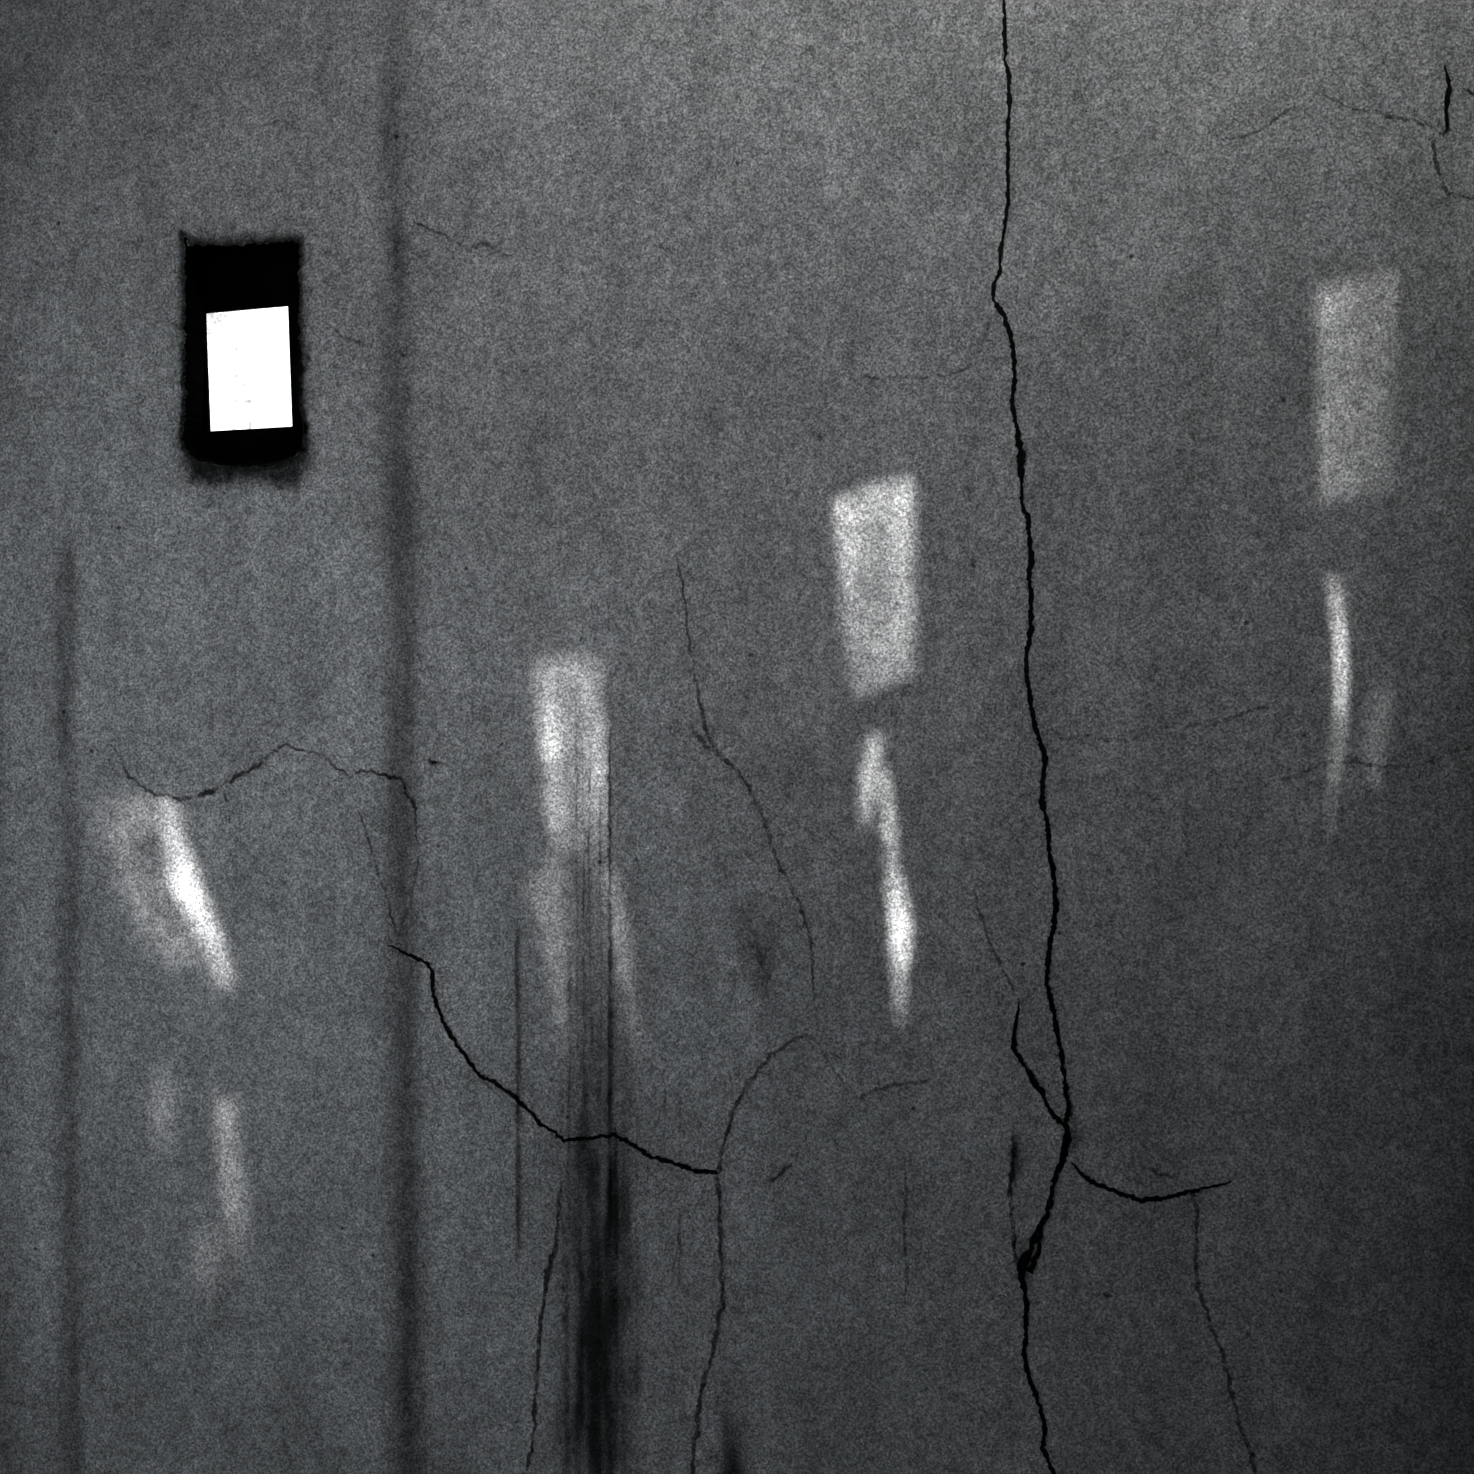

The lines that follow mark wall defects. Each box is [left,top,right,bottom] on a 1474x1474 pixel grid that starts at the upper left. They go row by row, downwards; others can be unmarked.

crack [1215,65,1474,200]
crack [113,743,440,864]
crack [676,554,815,993]
crack [867,0,1268,1474]
crack [360,815,811,1474]
crack [831,1066,927,1099]